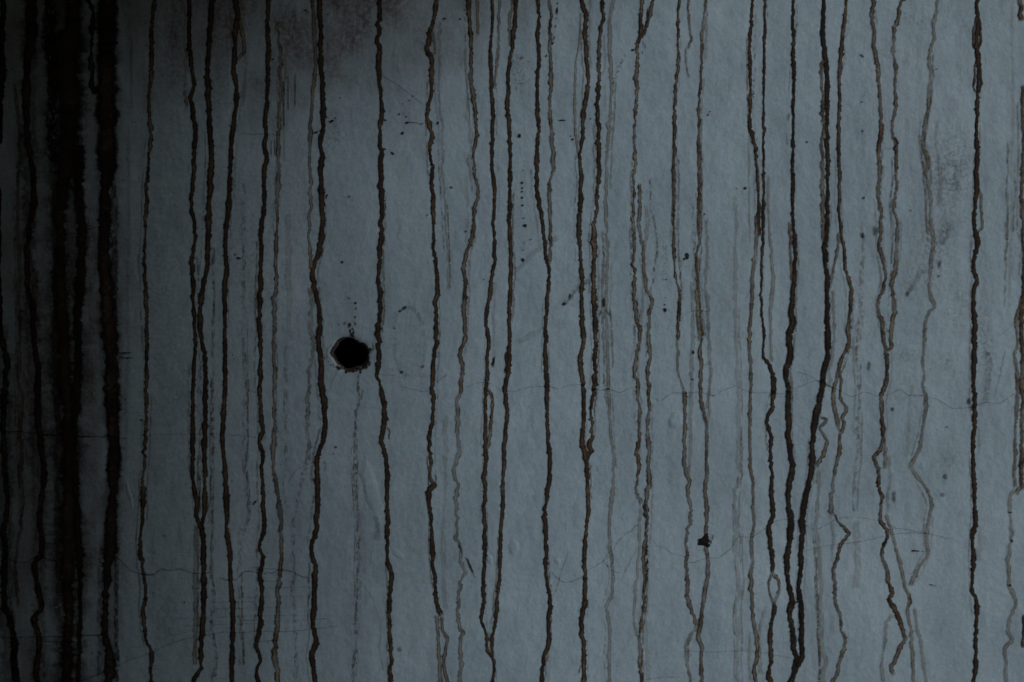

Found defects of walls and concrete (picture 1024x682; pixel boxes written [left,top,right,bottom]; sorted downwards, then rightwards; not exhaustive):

rust [183,0,296,682]
rust [294,0,328,682]
spalling [330,323,372,374]
rust [374,0,394,682]
rust [424,0,518,682]
rust [534,0,556,682]
rust [573,0,616,682]
rust [630,0,659,682]
rust [746,0,864,682]
rust [870,0,939,682]
rust [969,0,984,682]